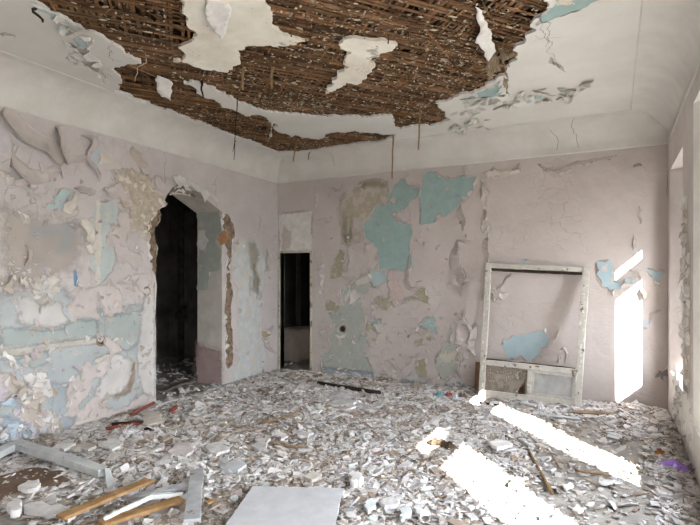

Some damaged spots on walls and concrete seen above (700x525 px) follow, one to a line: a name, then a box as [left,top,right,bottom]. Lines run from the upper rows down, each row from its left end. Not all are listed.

crack [537,22,566,73]
flaking render [29,0,599,151]
peeling [0,125,19,158]
peeling [315,163,521,385]
peeling [594,259,640,295]
peeling [647,268,665,286]
peeling [0,167,292,443]
peeling [501,328,550,361]
peeling [655,195,693,457]